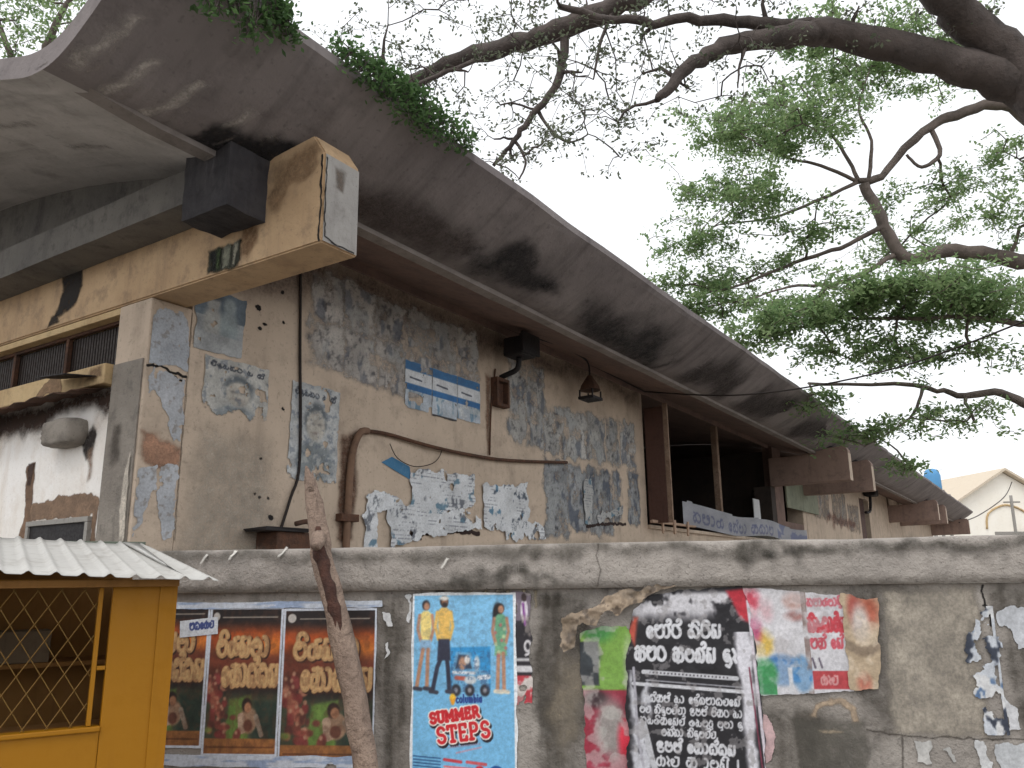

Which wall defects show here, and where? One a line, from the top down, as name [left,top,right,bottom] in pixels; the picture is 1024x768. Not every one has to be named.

damp [187,111,317,208]
crack [317,154,354,254]
damp [358,194,557,291]
damp [48,270,83,327]
crack [146,364,187,382]
peeling [148,308,190,441]
damp [580,306,668,368]
peeling [132,463,179,540]